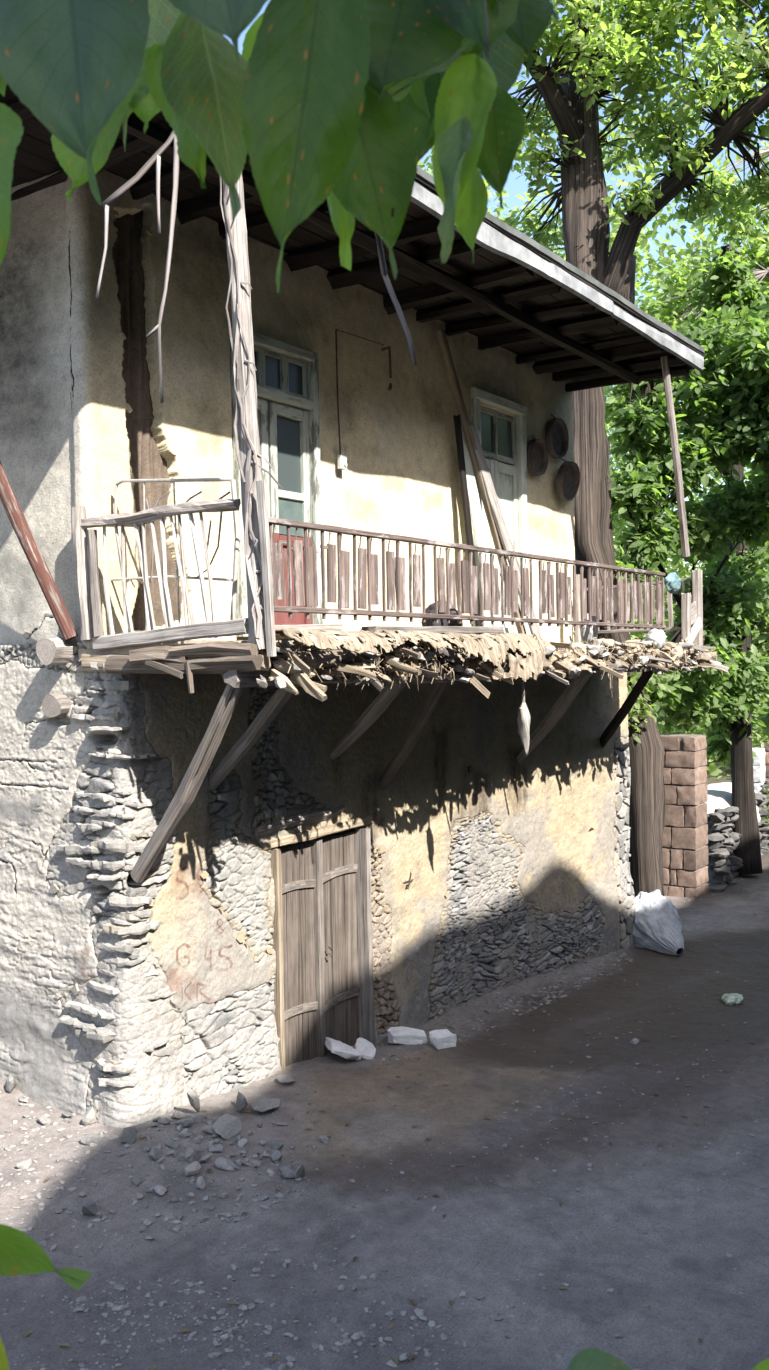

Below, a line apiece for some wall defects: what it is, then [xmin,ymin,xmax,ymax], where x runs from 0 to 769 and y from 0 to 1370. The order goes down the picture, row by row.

crack [67,242,75,409]
spalling [112,210,182,631]
crack [0,717,65,789]
crack [0,836,55,894]
spalling [0,631,280,1128]
spalling [371,844,400,1034]
spalling [428,737,636,1020]